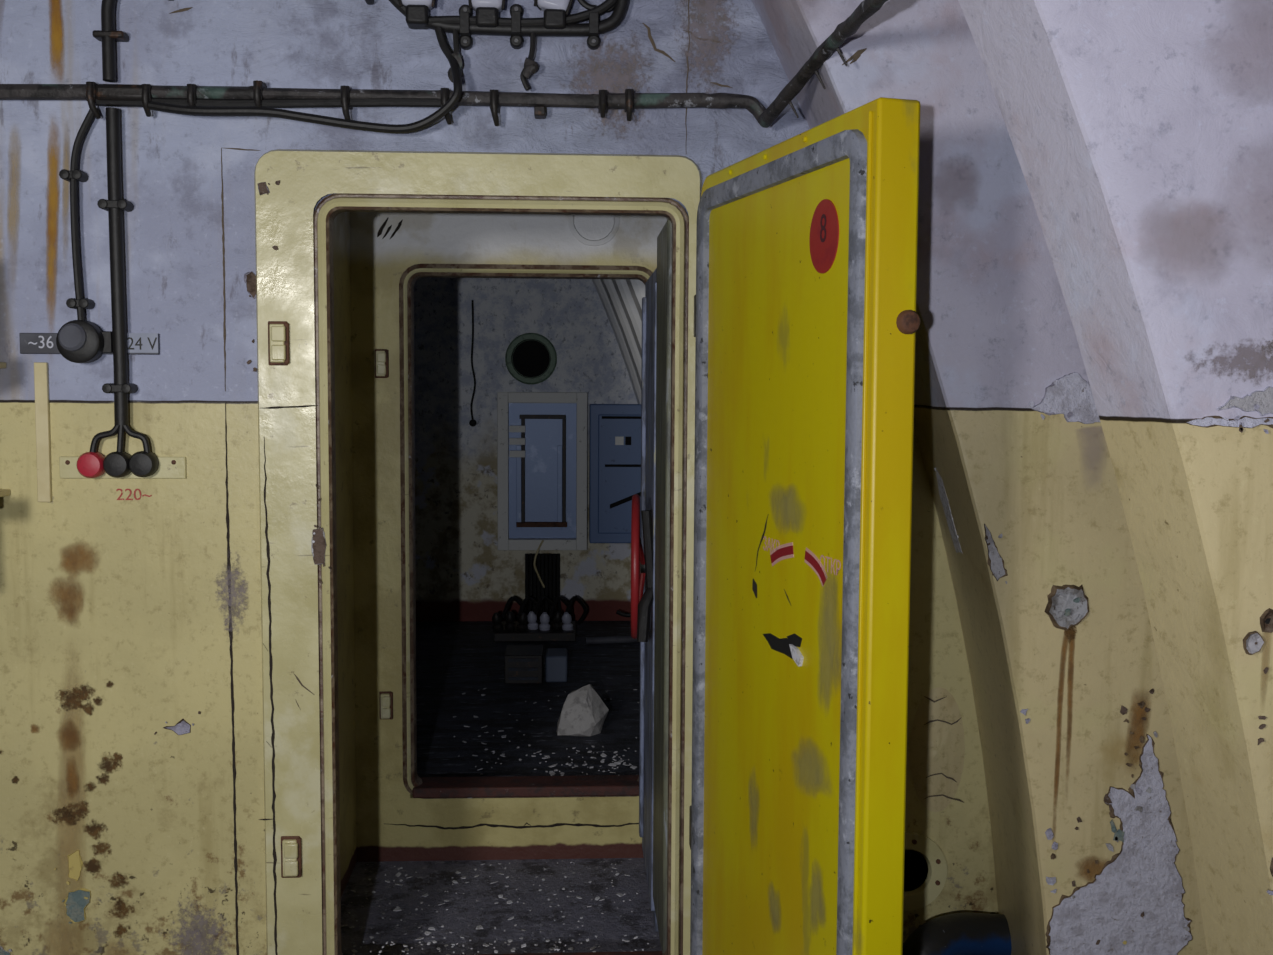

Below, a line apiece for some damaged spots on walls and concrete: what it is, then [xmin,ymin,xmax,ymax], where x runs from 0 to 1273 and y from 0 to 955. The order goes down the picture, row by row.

water stain [50,0,63,68]
water stain [9,158,18,231]
water stain [47,146,68,305]
peeling [1029,372,1100,424]
peeling [1184,386,1273,434]
water stain [1198,343,1273,381]
corrosion [56,546,93,620]
water stain [217,568,248,630]
corrosion [1054,626,1077,798]
corrosion [1129,701,1147,752]
corrosion [53,681,134,937]
peeling [1045,689,1193,955]